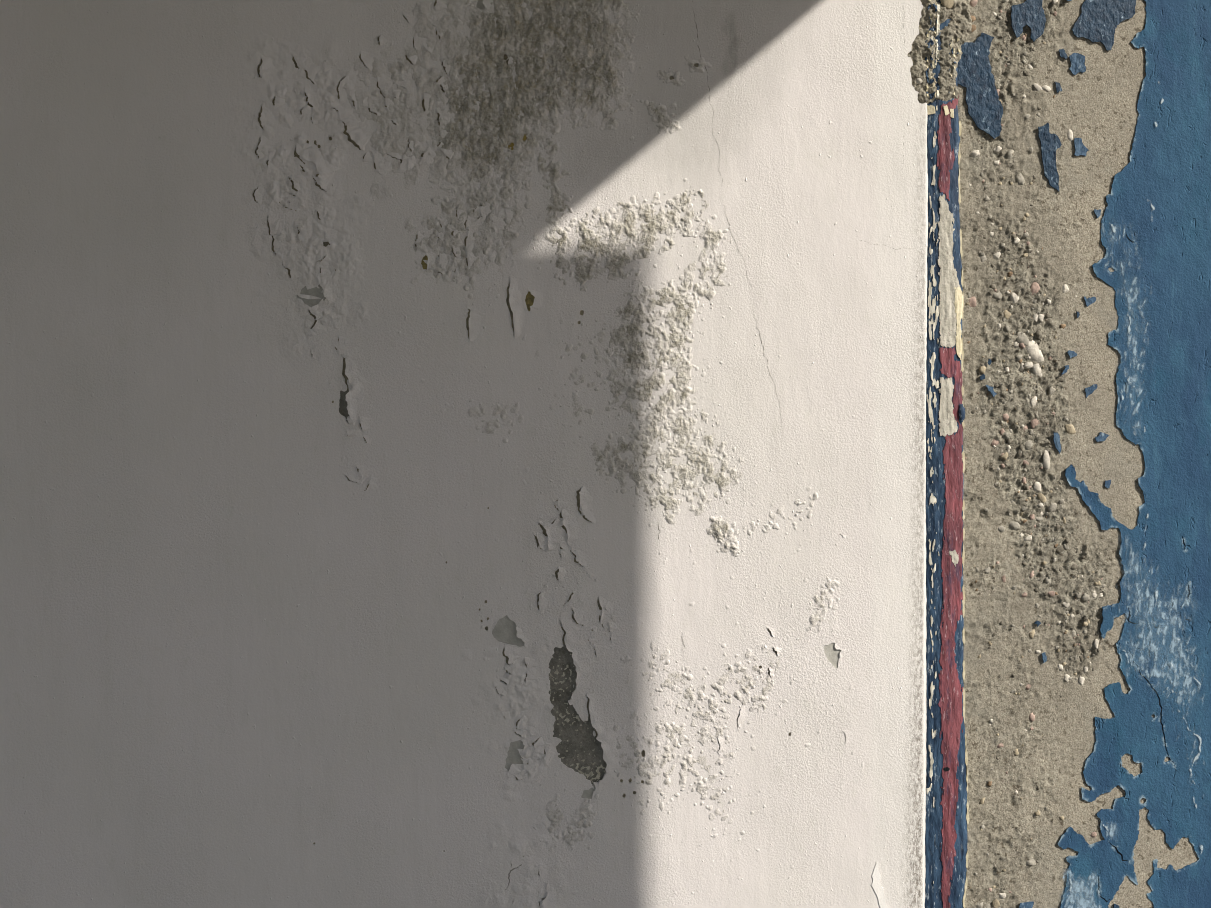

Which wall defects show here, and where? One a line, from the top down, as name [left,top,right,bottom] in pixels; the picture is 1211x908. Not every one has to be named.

spalling [346,0,648,275]
peeling [283,235,338,311]
peeling [339,352,367,425]
spalling [907,0,1146,908]
peeling [534,486,593,583]
spalling [492,615,529,664]
spalling [503,739,528,778]
peeling [549,612,621,799]
crack [1127,585,1190,771]
spalling [1108,798,1199,908]